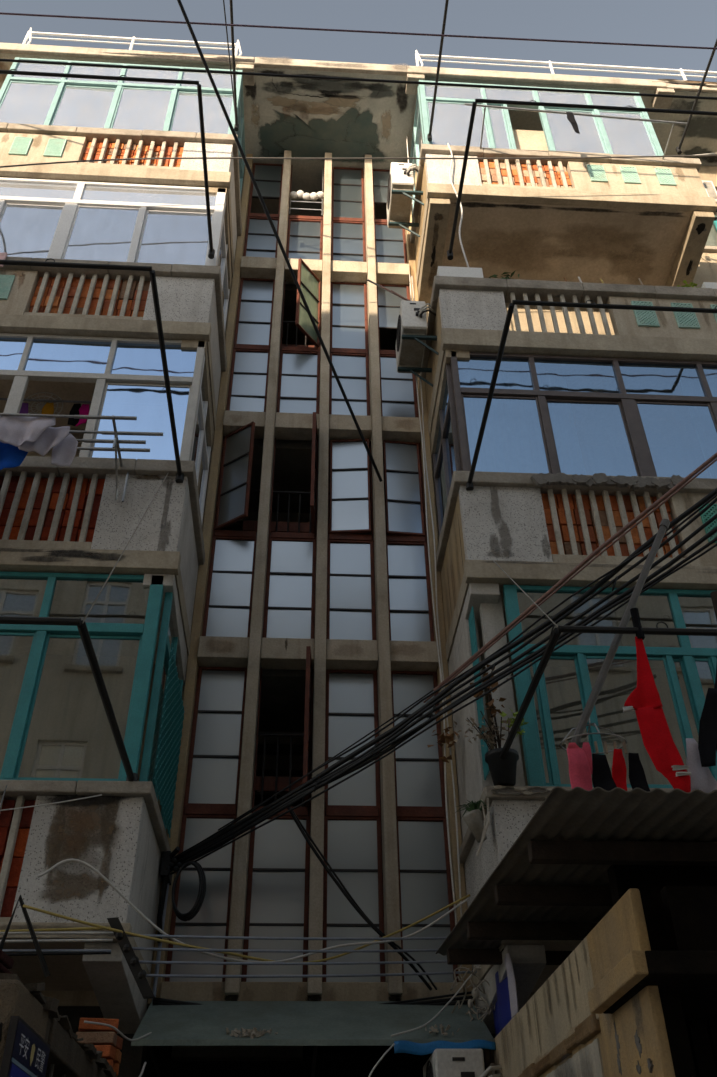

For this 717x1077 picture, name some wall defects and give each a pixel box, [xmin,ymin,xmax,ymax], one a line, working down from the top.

damp [106,52,408,162]
damp [670,101,717,163]
damp [487,489,550,564]
damp [43,794,127,902]
peeling [634,1029,654,1074]